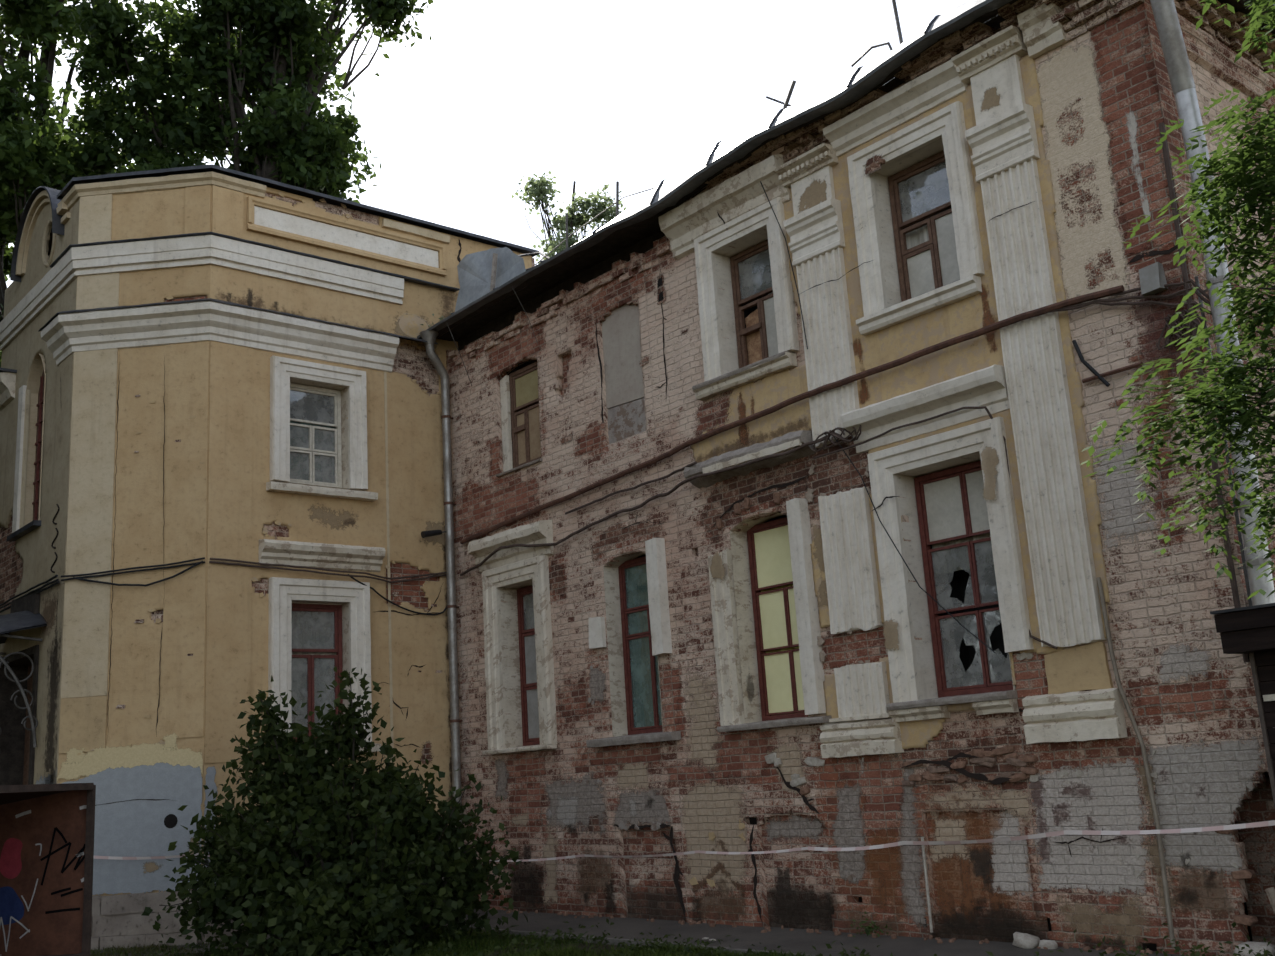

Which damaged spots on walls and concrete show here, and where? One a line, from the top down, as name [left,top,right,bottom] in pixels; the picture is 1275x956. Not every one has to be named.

flaking render [1090,3,1182,258]
crack [658,303,667,393]
spalling [0,516,23,610]
spalling [1013,652,1048,710]
peeling [57,733,203,781]
crack [776,767,819,814]
peeling [580,729,1268,897]
crack [745,825,763,924]
damp [769,868,834,928]